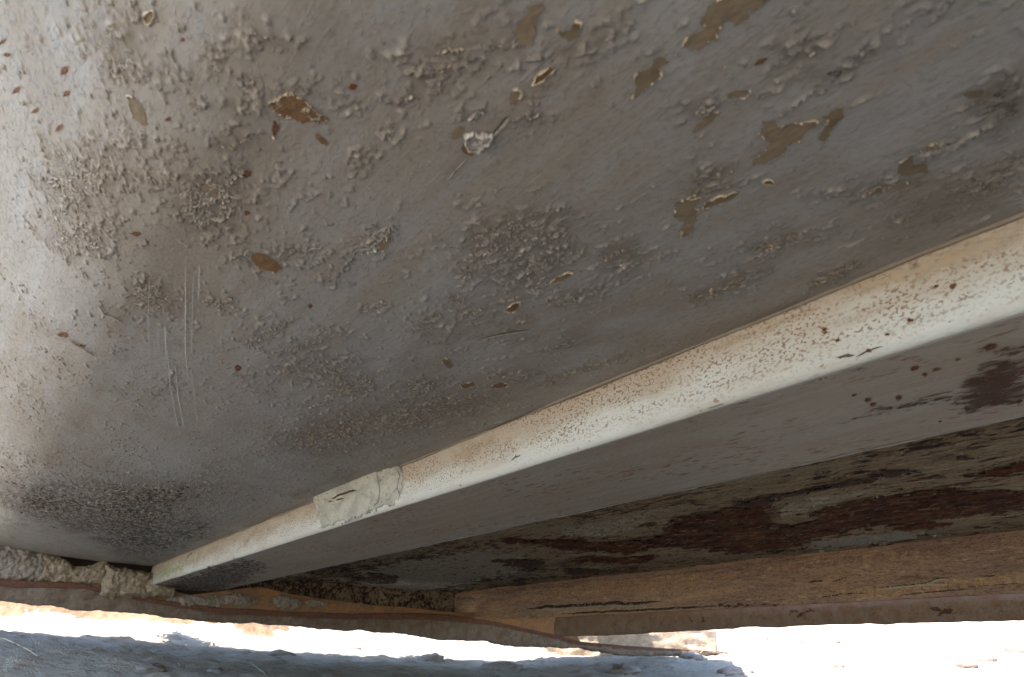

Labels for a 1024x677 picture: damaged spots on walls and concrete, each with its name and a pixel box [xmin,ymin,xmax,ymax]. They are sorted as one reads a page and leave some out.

peeling [680,0,768,52]
peeling [631,57,669,100]
peeling [266,90,330,146]
peeling [451,126,495,156]
peeling [752,107,845,166]
peeling [895,156,930,176]
peeling [673,191,738,239]
peeling [251,252,283,274]
rust [851,344,1024,419]
rust [500,453,1024,575]